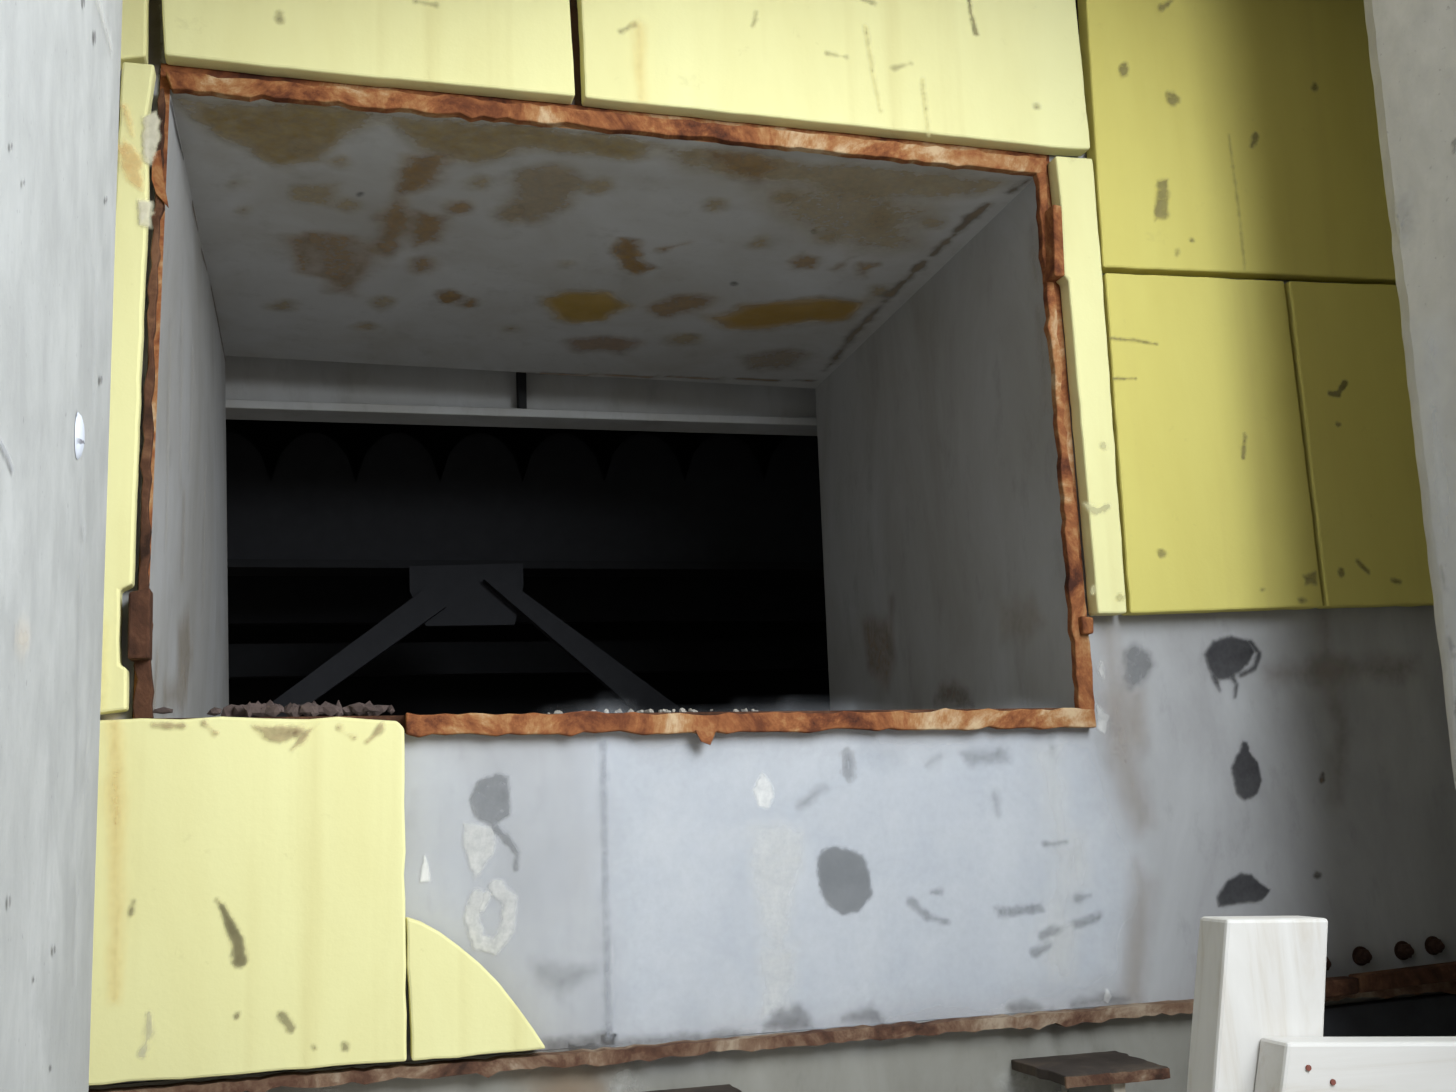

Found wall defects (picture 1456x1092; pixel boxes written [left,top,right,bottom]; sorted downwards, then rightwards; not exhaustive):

rust [119,0,1096,738]